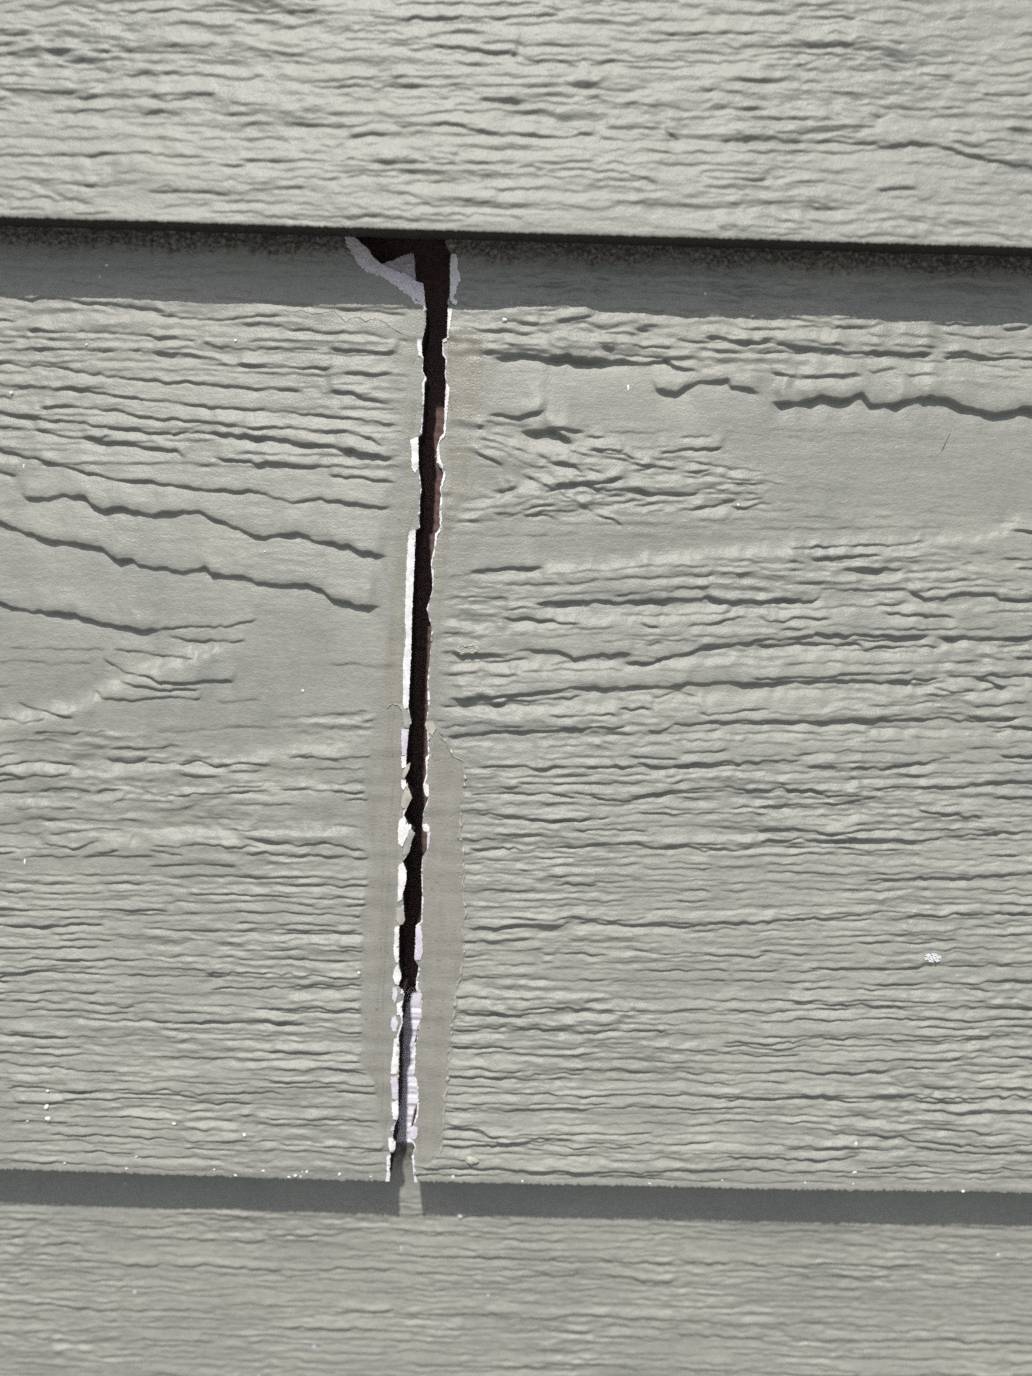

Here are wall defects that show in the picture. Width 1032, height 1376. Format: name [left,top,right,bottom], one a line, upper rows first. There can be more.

crack [288,237,450,974]
peeling [345,237,461,1182]